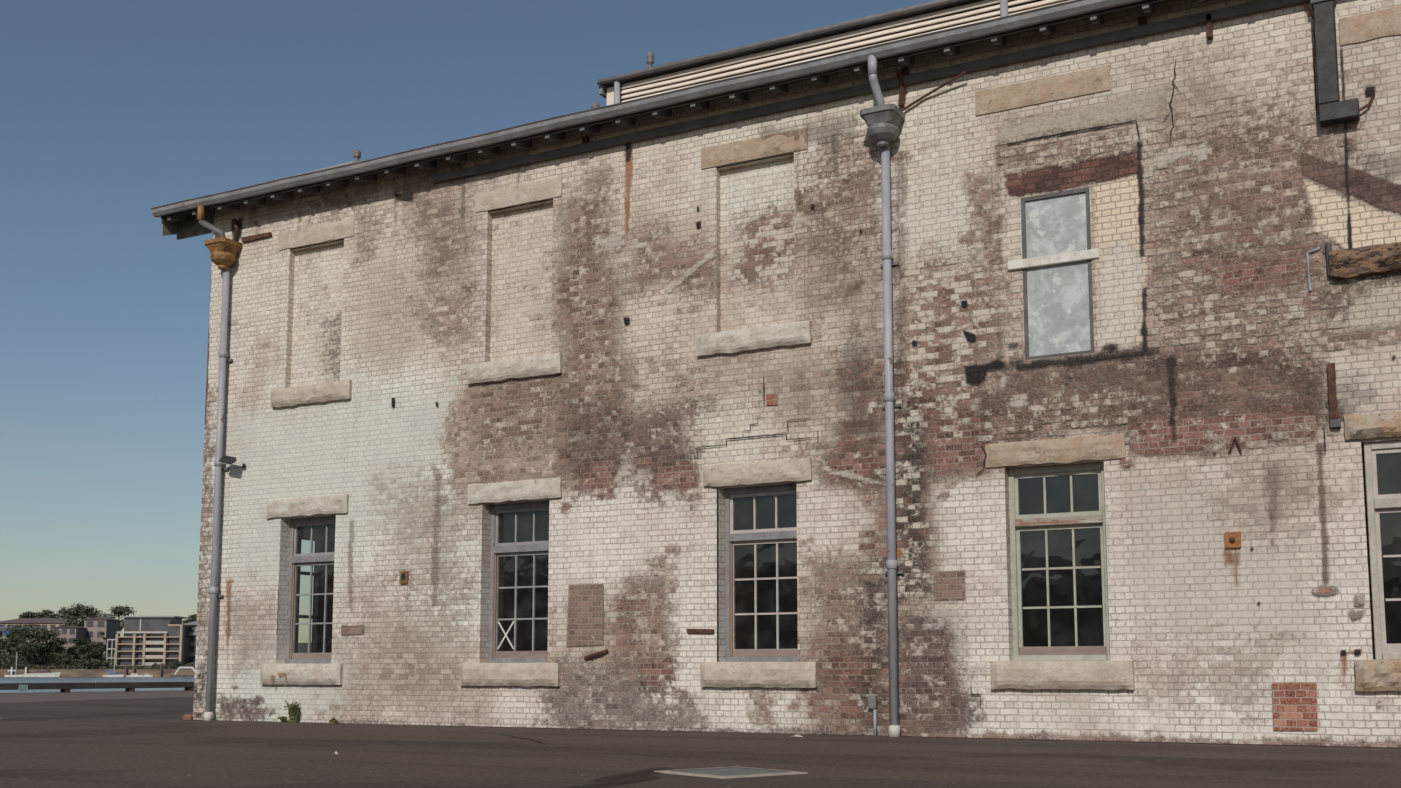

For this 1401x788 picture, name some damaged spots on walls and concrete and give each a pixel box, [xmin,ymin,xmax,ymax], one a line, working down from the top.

peeling [395,172,476,347]
corrosion [624,143,632,237]
crack [995,60,1182,147]
peeling [437,92,1401,736]